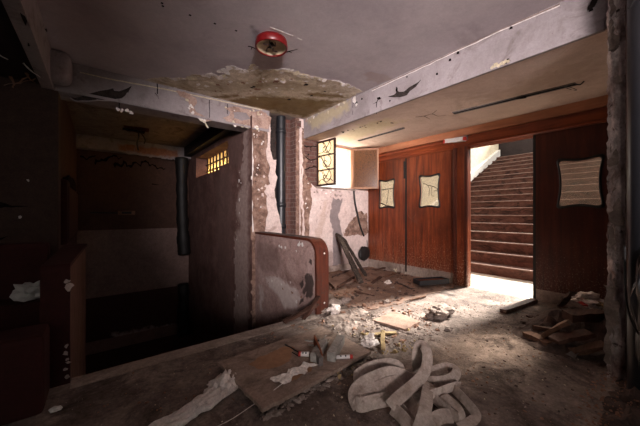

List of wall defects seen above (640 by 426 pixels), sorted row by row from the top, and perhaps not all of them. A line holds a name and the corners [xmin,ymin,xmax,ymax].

crack [80,72,262,118]
peeling [142,64,363,128]
crack [372,4,560,114]
flaking render [223,106,282,334]
spalling [296,121,356,252]
spalling [344,211,368,236]
spalling [603,263,621,365]